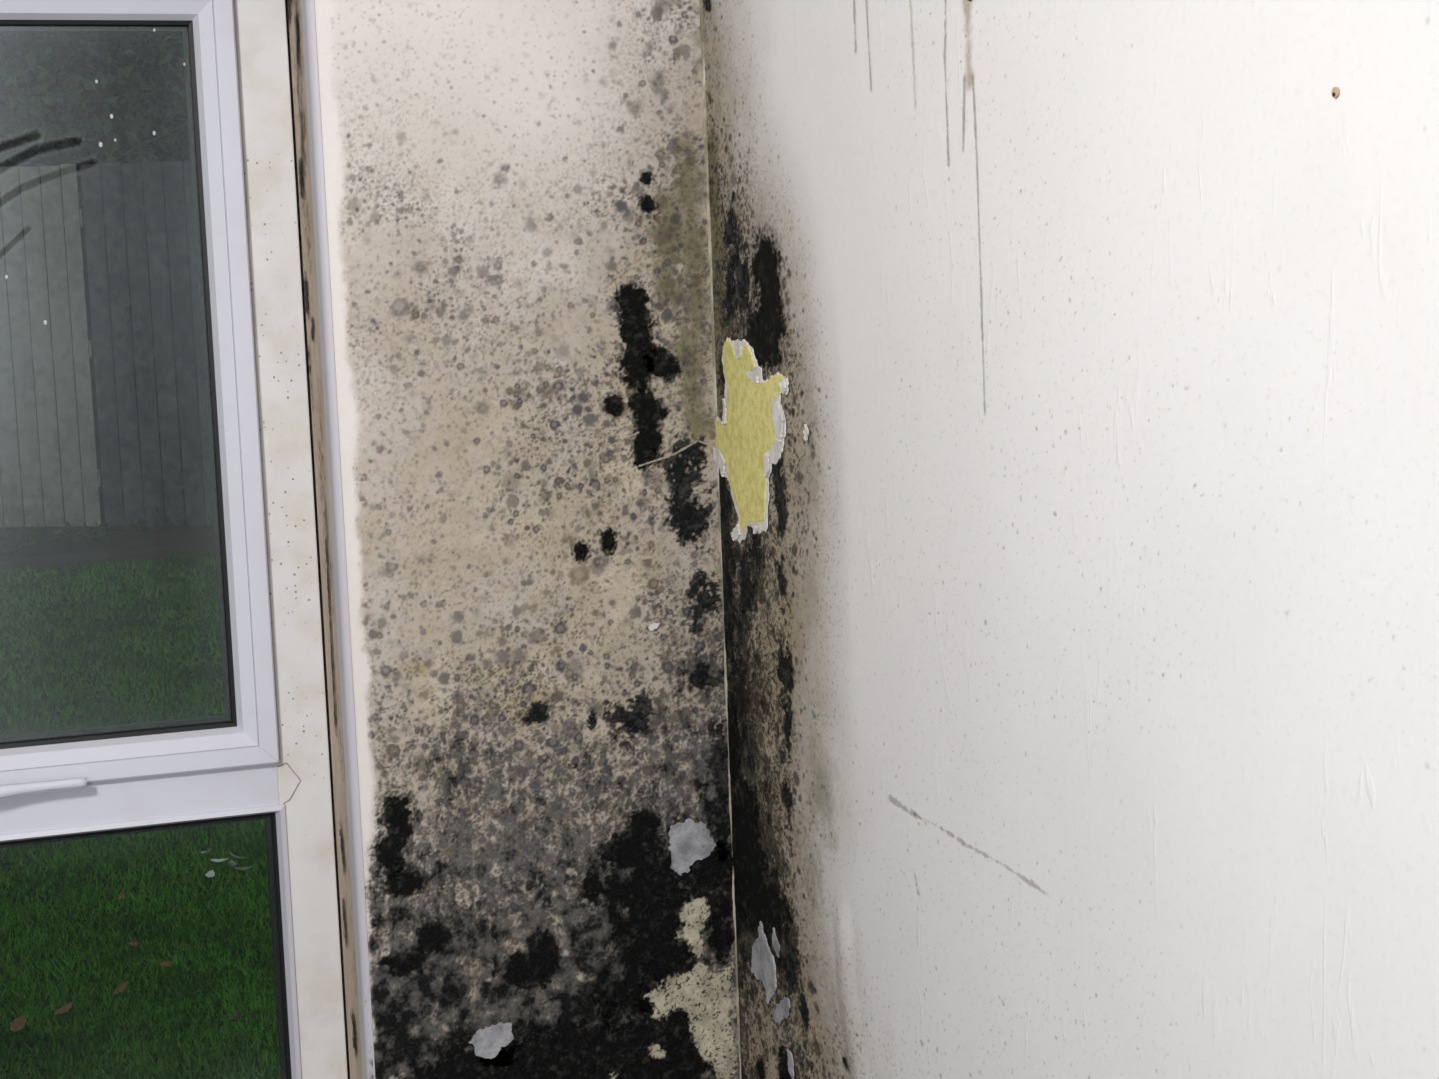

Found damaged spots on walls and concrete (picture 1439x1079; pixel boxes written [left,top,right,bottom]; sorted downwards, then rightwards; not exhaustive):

water stain [287,0,310,248]
water stain [303,271,321,427]
water stain [323,510,338,732]
water stain [350,0,849,1079]
peeling [713,337,789,544]
peeling [668,818,717,876]
peeling [469,1022,514,1059]